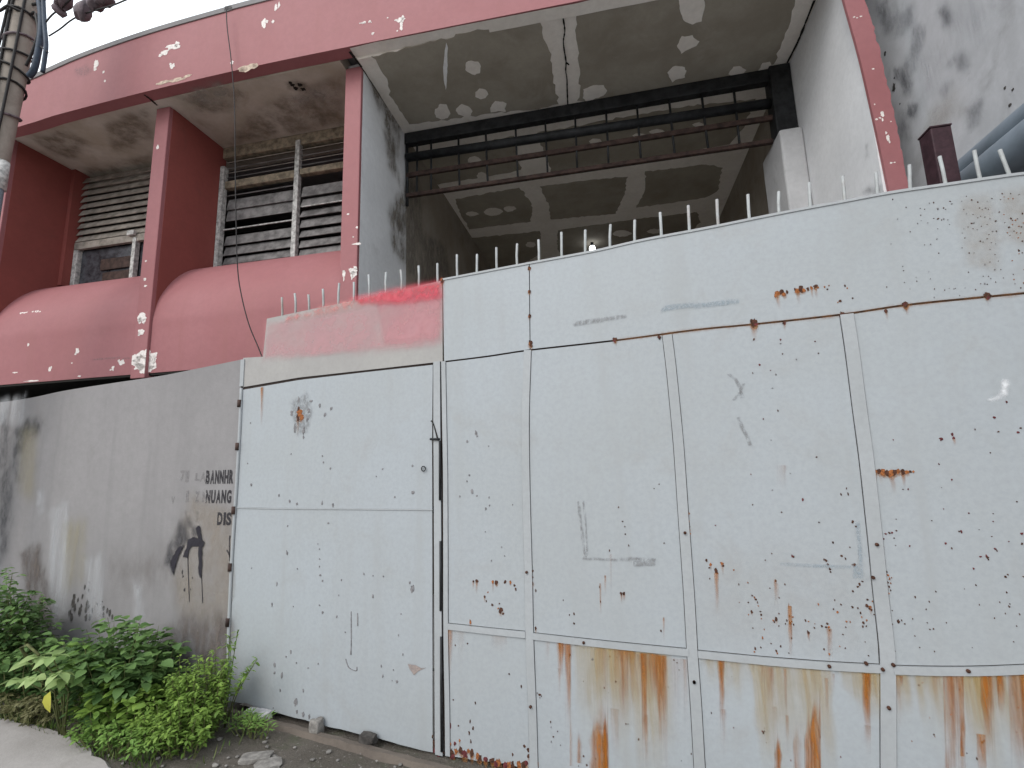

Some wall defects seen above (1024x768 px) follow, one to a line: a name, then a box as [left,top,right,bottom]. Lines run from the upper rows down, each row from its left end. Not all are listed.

peeling [156,41,192,85]
peeling [230,61,258,73]
crack [562,18,570,104]
corrosion [774,284,830,298]
peeling [110,349,157,373]
corrosion [875,469,915,478]
corrosion [739,579,830,655]
corrosion [641,653,678,693]
corrosion [981,675,1024,719]
corrosion [432,720,539,768]
corrosion [578,724,607,768]
corrosion [807,710,821,768]